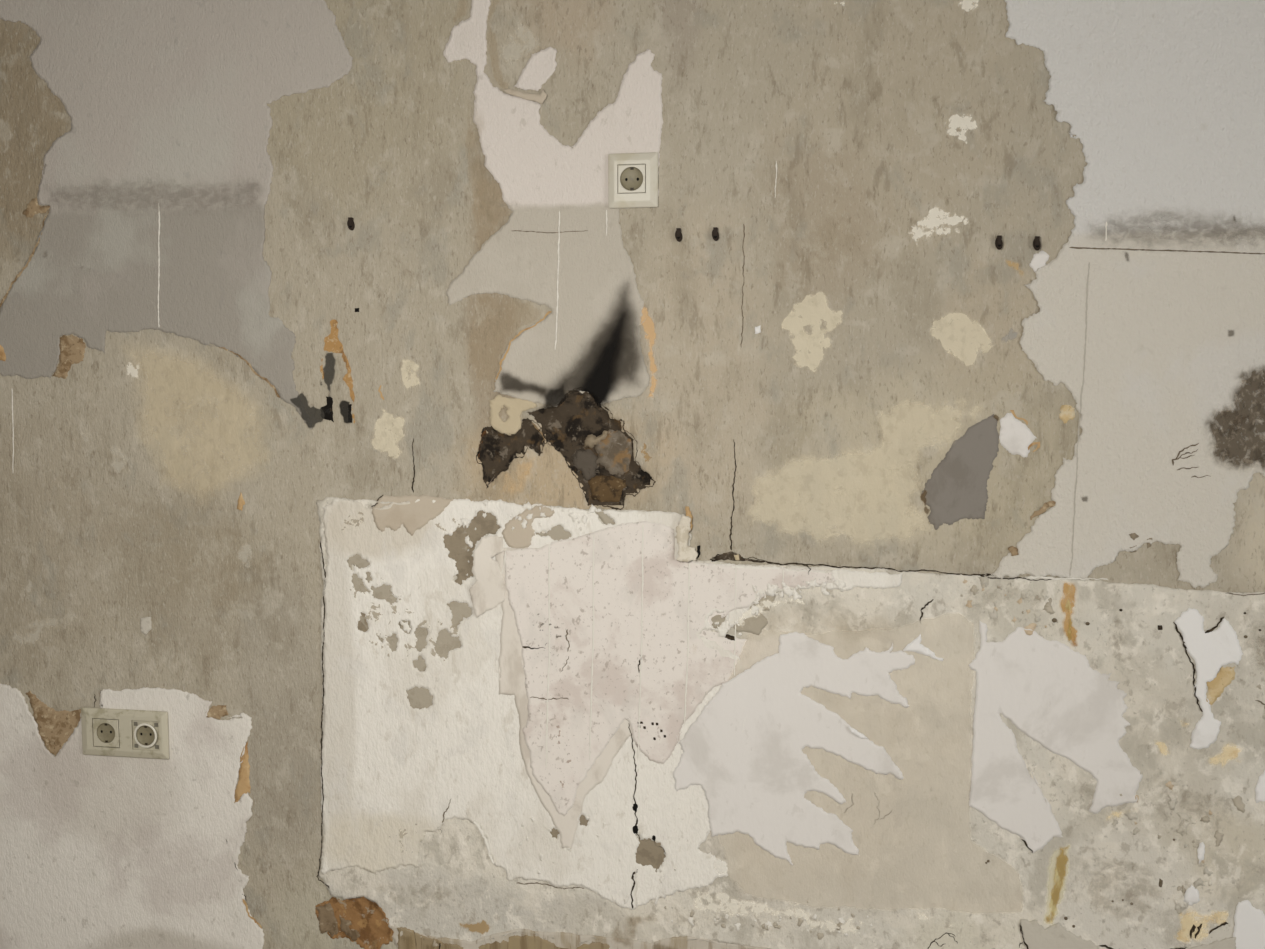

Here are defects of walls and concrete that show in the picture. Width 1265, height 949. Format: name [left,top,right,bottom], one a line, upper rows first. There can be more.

damp [1209,369,1265,469]
flaking render [315,389,1265,949]
crack [628,725,665,908]